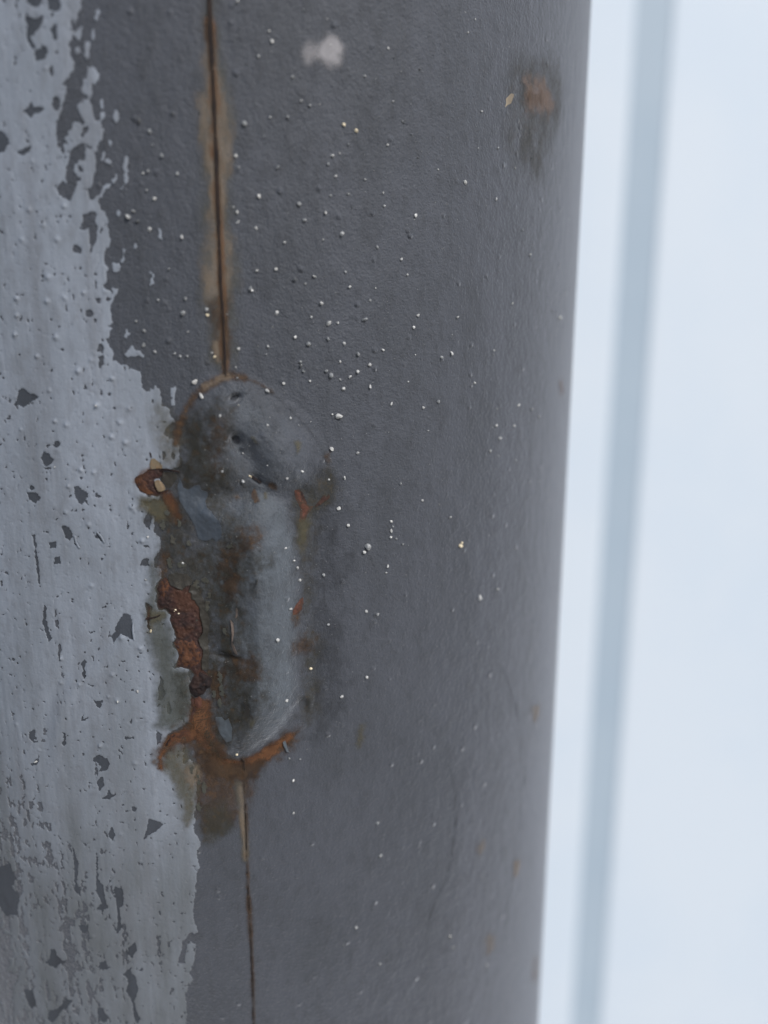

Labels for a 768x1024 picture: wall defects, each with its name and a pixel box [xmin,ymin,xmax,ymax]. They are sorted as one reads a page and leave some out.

peeling [25,0,61,61]
peeling [0,131,31,156]
crack [208,0,226,375]
corrosion [173,59,265,445]
peeling [14,388,38,408]
peeling [74,486,88,505]
spalling [134,452,177,496]
peeling [32,526,80,587]
peeling [112,613,135,644]
spalling [146,572,212,722]
corrosion [150,553,297,821]
peeling [70,843,124,934]